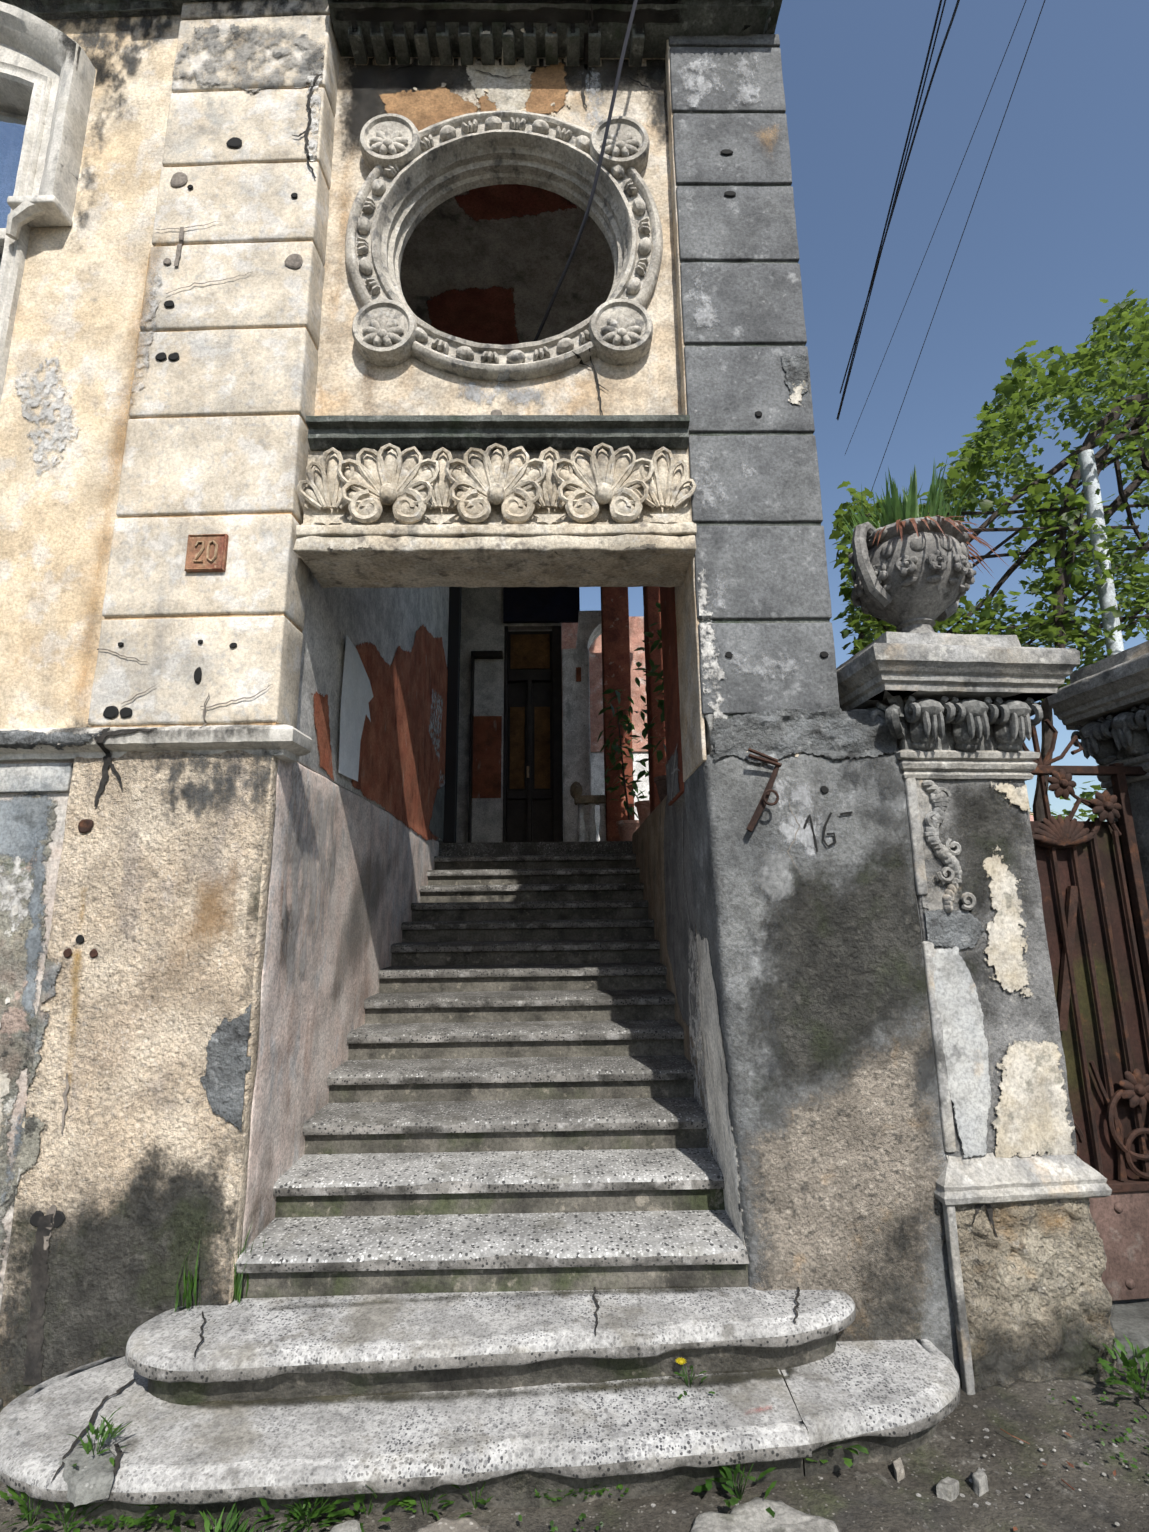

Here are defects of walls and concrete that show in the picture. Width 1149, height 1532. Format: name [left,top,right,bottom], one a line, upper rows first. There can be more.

damp [209,0,317,19]
peeling [379,28,571,131]
crack [94,648,157,807]
crack [199,684,272,728]
peeling [282,624,448,985]
peeling [0,790,98,1281]
spalling [200,1002,257,1132]
peeling [664,750,1075,1341]
damp [0,1151,237,1405]
crack [592,1287,600,1336]
crack [793,1287,801,1323]
crack [52,1379,135,1480]